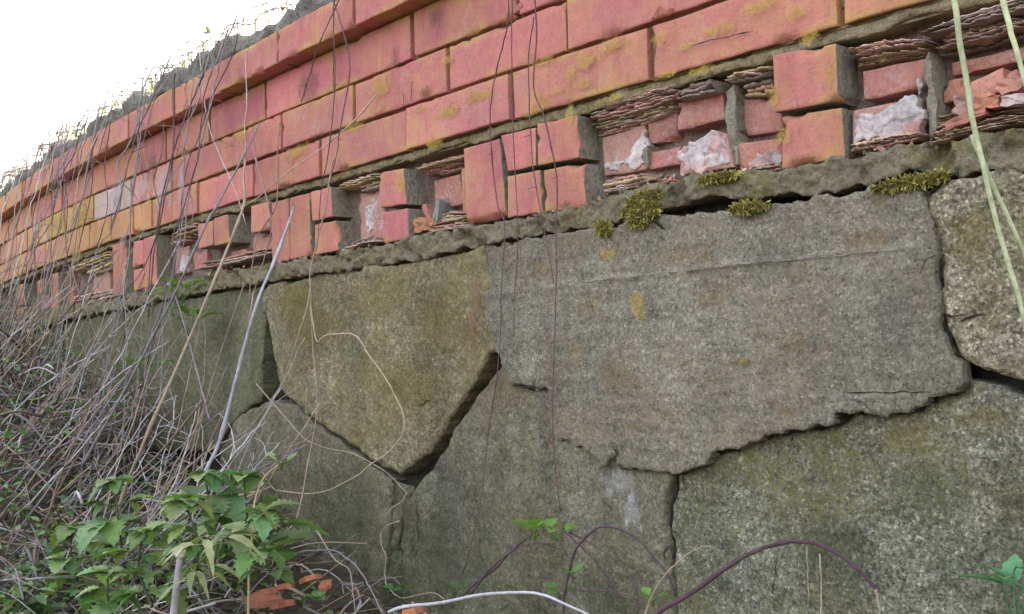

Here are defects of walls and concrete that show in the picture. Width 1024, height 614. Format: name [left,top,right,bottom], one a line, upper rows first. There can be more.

spalling [336,173,381,193]
spalling [416,155,465,178]
damp [604,129,654,171]
damp [677,130,734,177]
damp [748,150,782,169]
damp [853,78,929,144]
spalling [851,107,1024,155]
spalling [345,234,385,249]
spalling [428,211,477,233]
crack [459,364,543,424]
crack [663,254,1024,559]